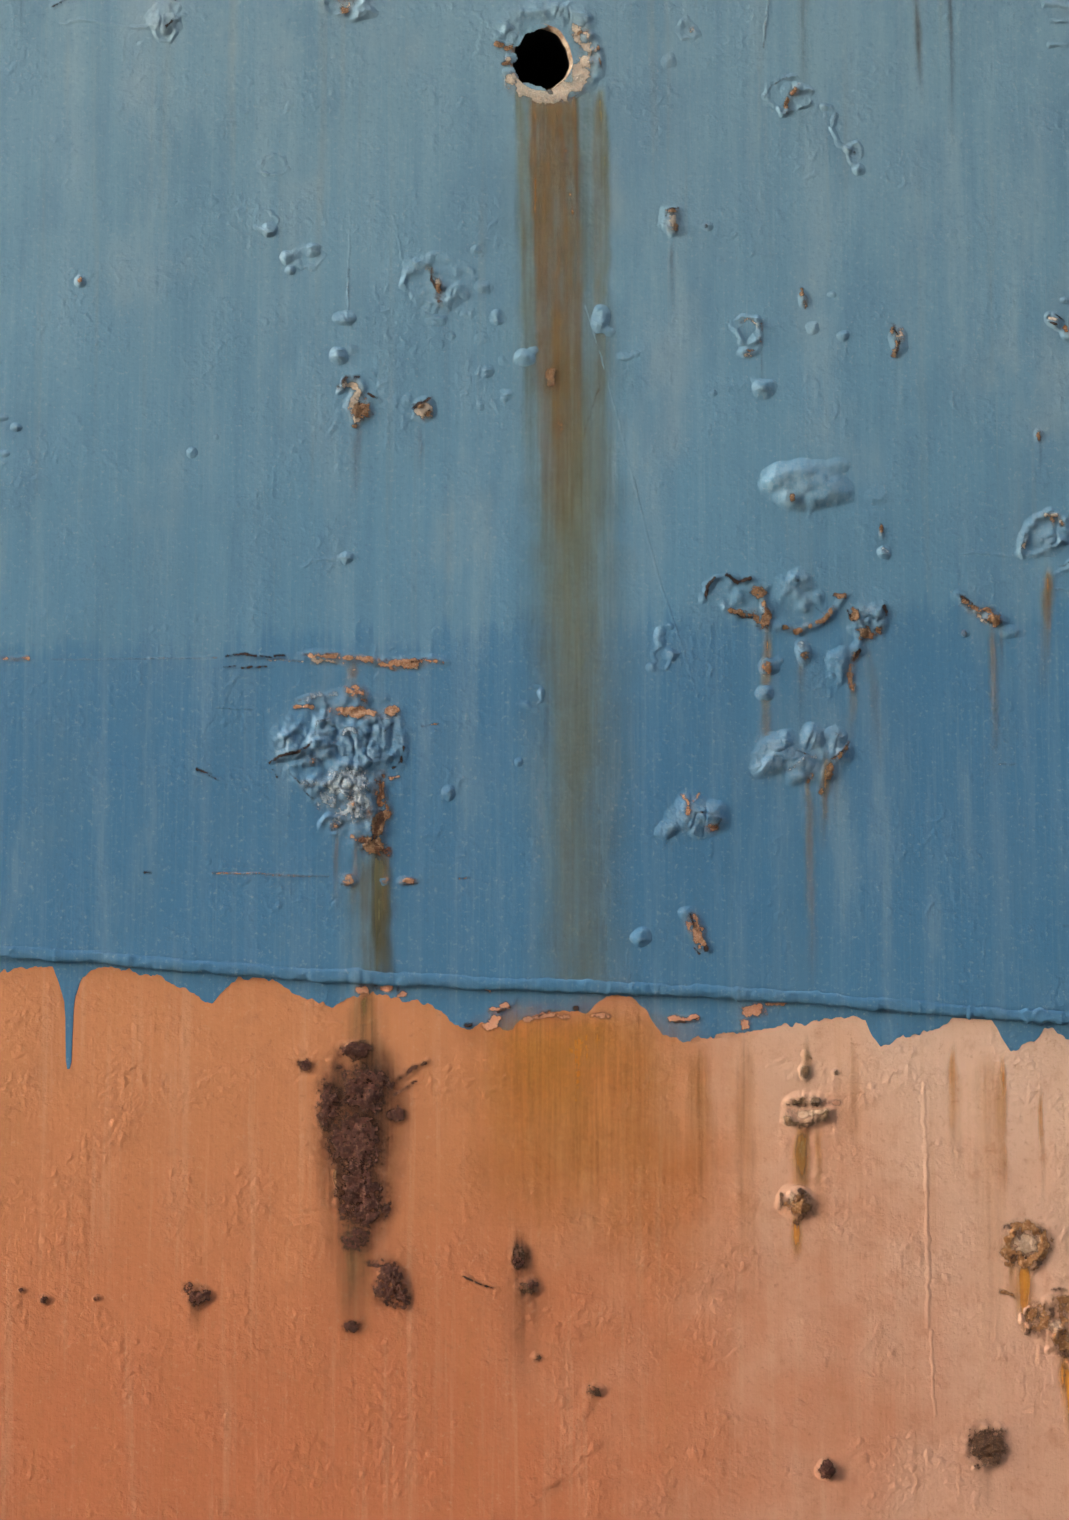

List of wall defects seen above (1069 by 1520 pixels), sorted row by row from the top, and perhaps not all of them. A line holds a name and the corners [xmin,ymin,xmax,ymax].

peeling [493,23,607,106]
rust [949,588,1027,639]
rust [754,638,812,702]
peeling [355,985,407,997]
peeling [464,989,609,1031]
peeling [667,1014,699,1023]
peeling [740,1002,785,1030]
rust [774,1183,819,1245]
rust [1000,1218,1069,1410]
rust [958,1417,1014,1476]